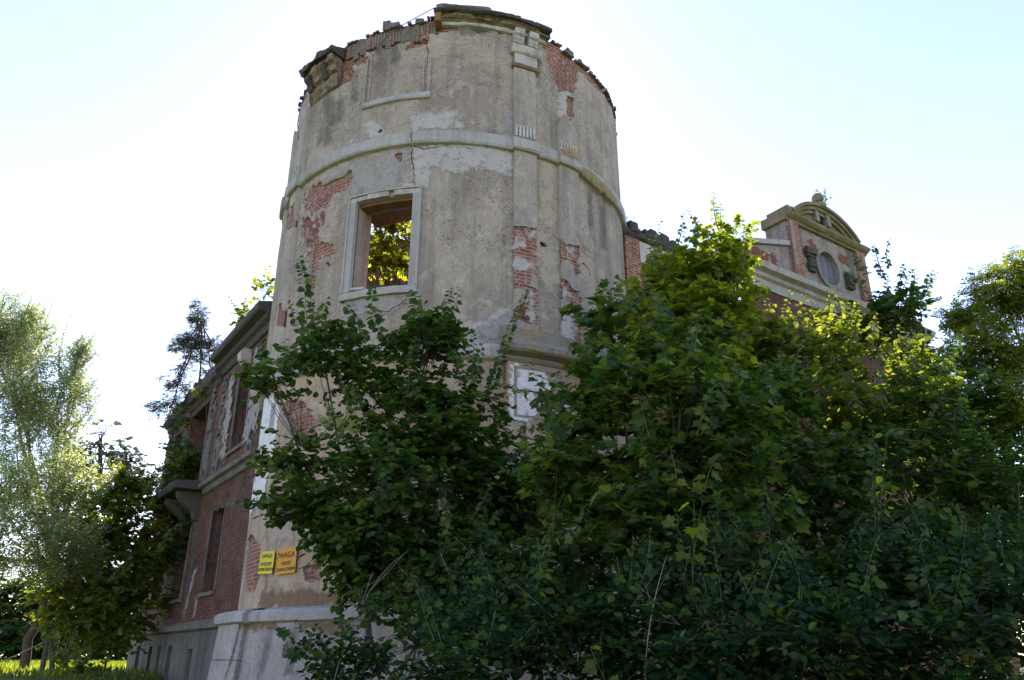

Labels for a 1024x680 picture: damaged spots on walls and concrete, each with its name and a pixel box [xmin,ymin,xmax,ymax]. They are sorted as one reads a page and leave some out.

flaking render [341,21,458,85]
flaking render [542,41,577,118]
crack [410,128,473,182]
peeling [286,145,514,290]
flaking render [463,160,582,344]
peeling [219,372,235,460]
peeling [242,348,318,593]